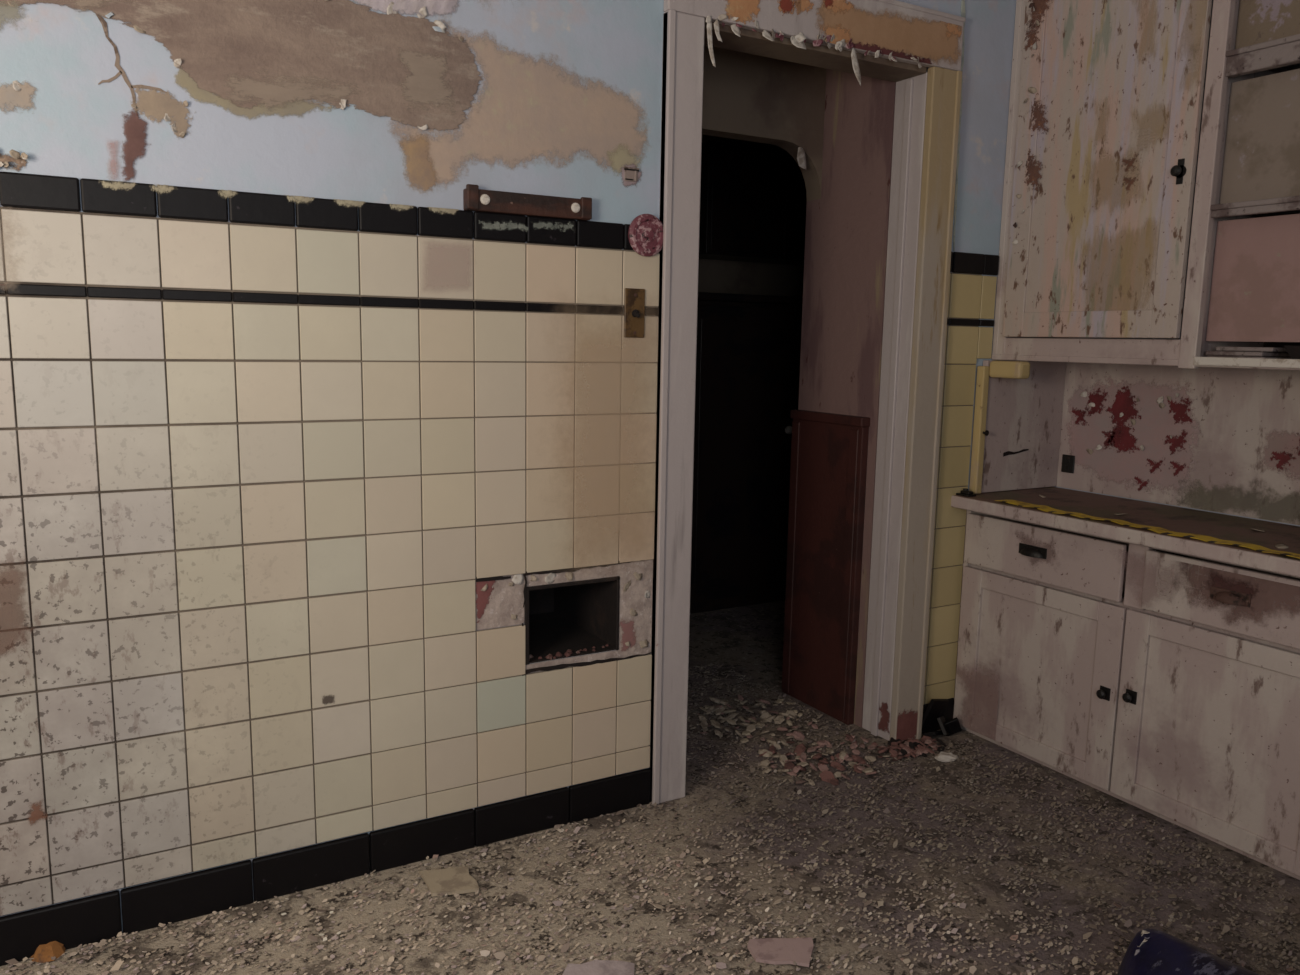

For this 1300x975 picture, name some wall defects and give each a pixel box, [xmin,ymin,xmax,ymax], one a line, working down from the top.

crack [95,13,165,113]
peeling [0,0,482,138]
peeling [706,0,962,86]
peeling [1024,87,1049,134]
peeling [1025,0,1049,57]
peeling [0,149,28,171]
peeling [1011,149,1046,244]
peeling [1122,152,1139,193]
peeling [1068,378,1200,491]
peeling [1264,432,1300,478]
spalling [475,560,653,674]
spalling [878,699,962,740]